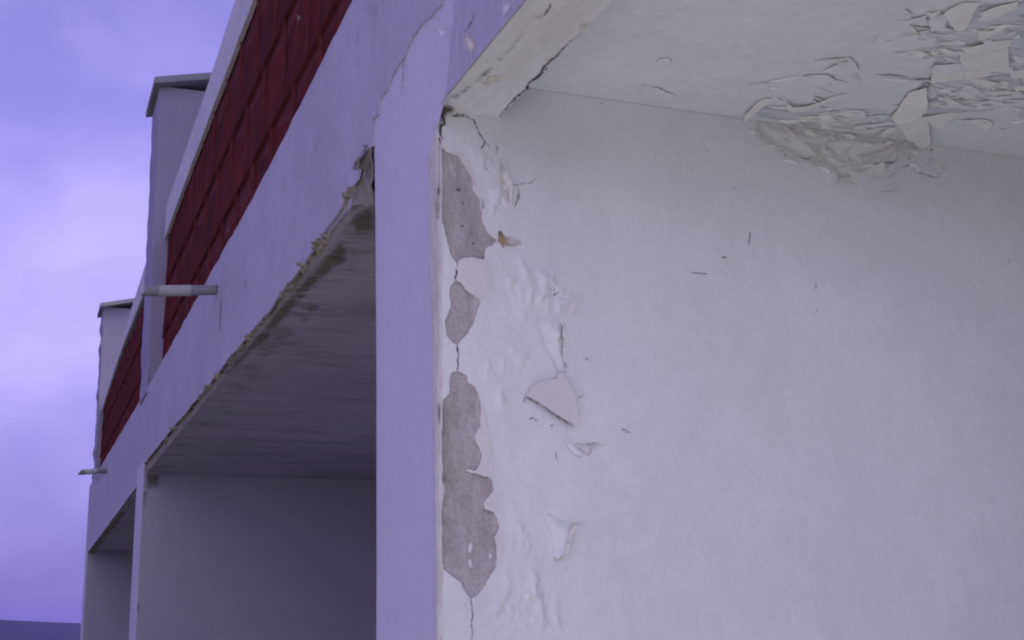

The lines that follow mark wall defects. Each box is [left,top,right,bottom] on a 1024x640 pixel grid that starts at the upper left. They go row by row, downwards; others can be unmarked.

flaking render [341,145,375,212]
peeling [434,146,495,345]
crack [438,114,498,150]
crack [506,48,564,109]
peeling [744,2,1024,171]
flaking render [147,233,331,464]
peeling [438,371,505,599]